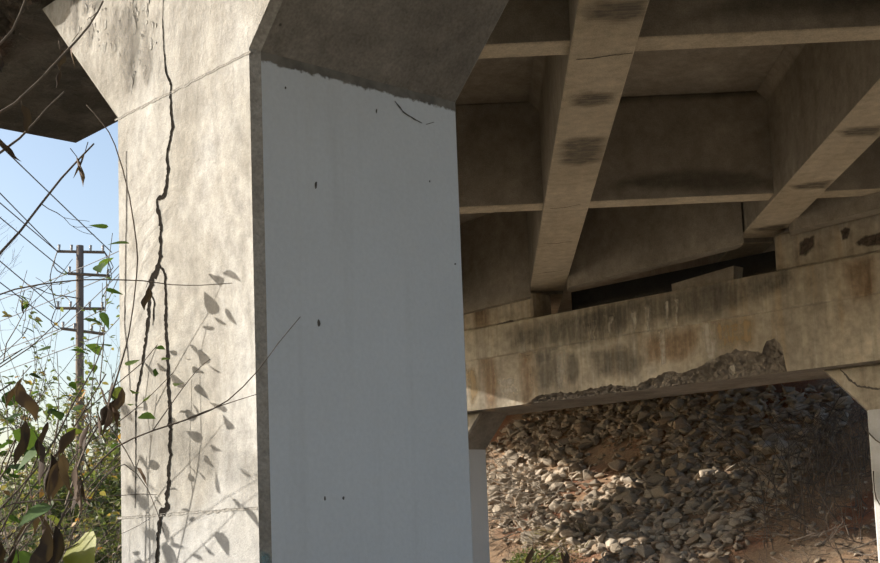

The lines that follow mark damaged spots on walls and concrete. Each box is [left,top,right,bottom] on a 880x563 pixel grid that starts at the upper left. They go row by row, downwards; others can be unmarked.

spalling [0,0,35,41]
crack [124,0,174,563]
water stain [515,273,789,387]